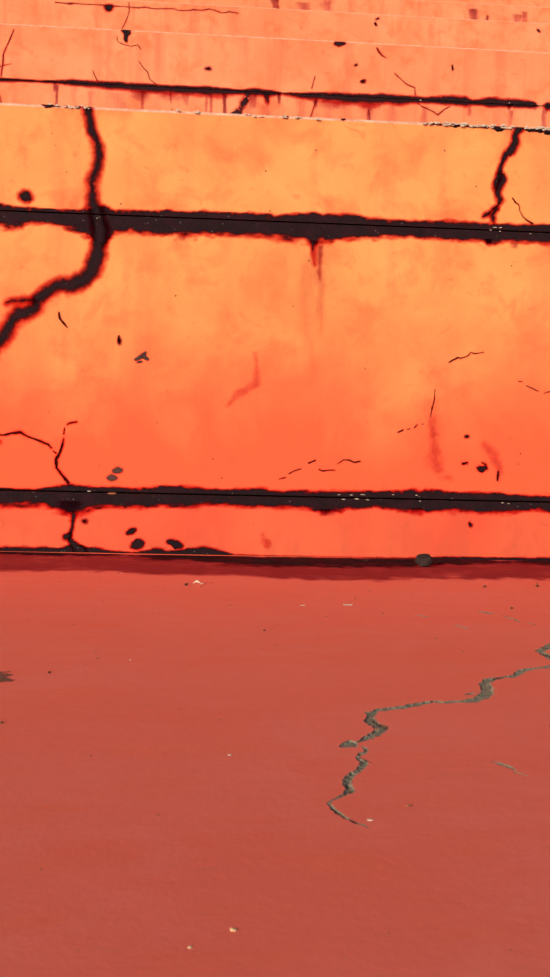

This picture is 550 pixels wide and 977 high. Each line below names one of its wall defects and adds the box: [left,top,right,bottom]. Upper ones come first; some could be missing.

water stain [0,78,550,114]
crack [482,127,533,225]
crack [0,106,108,348]
water stain [0,203,550,258]
crack [0,421,77,484]
water stain [0,484,550,515]
crack [62,512,86,553]
crack [326,611,550,829]